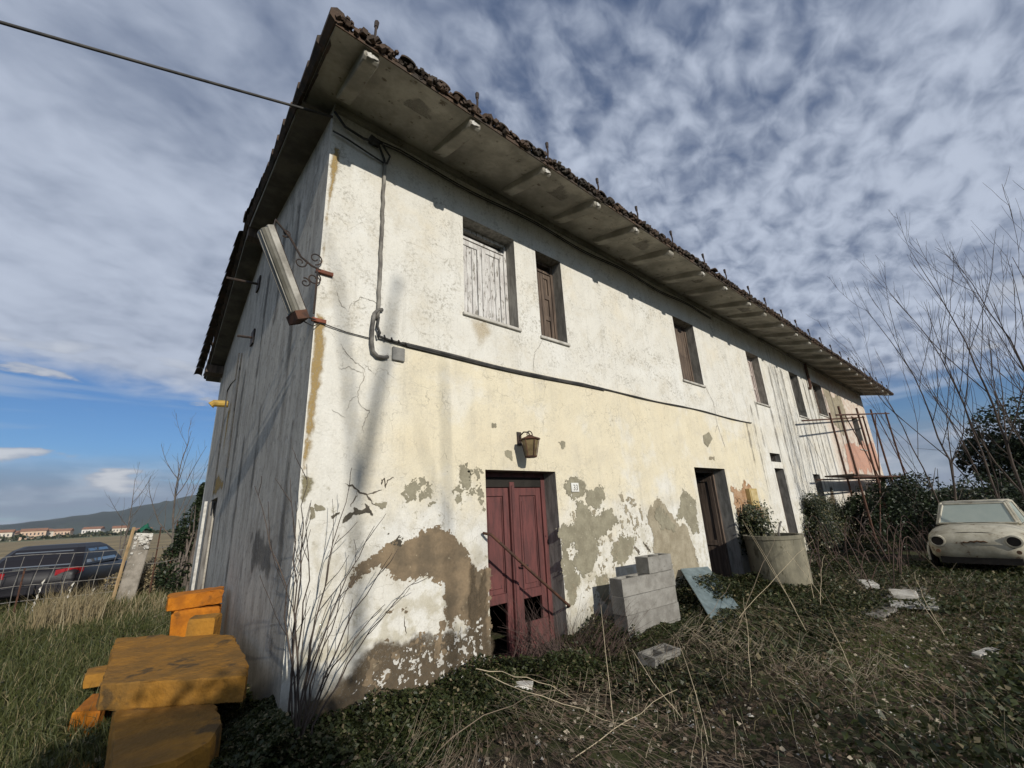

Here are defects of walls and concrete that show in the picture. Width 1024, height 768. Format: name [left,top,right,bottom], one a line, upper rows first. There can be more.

crack [332,346,372,430]
crack [345,483,380,505]
peeling [401,476,436,507]
peeling [447,462,486,512]
flaking render [730,480,770,522]
peeling [556,476,700,612]
flaking render [348,525,493,711]